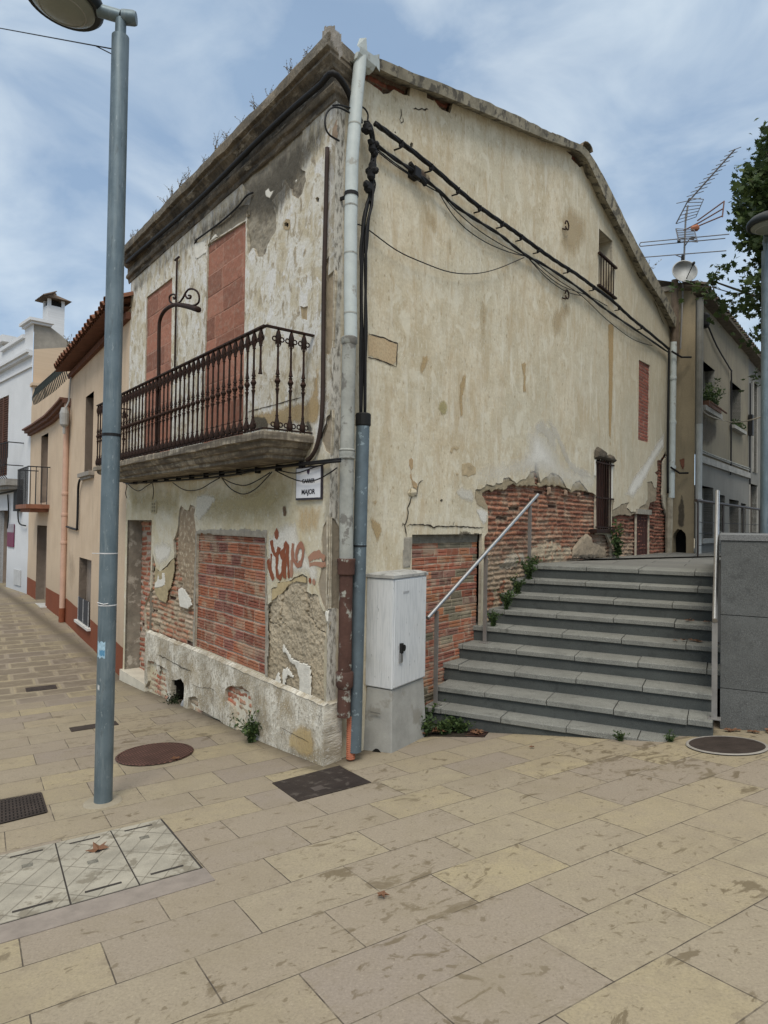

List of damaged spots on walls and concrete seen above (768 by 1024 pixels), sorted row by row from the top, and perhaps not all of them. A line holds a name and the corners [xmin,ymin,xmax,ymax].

peeling [209,131,306,257]
flaking render [146,505,200,646]
flaking render [267,515,339,701]
crack [402,458,483,536]
flaking render [475,455,665,622]
flaking render [148,661,212,717]
flaking render [228,686,252,726]